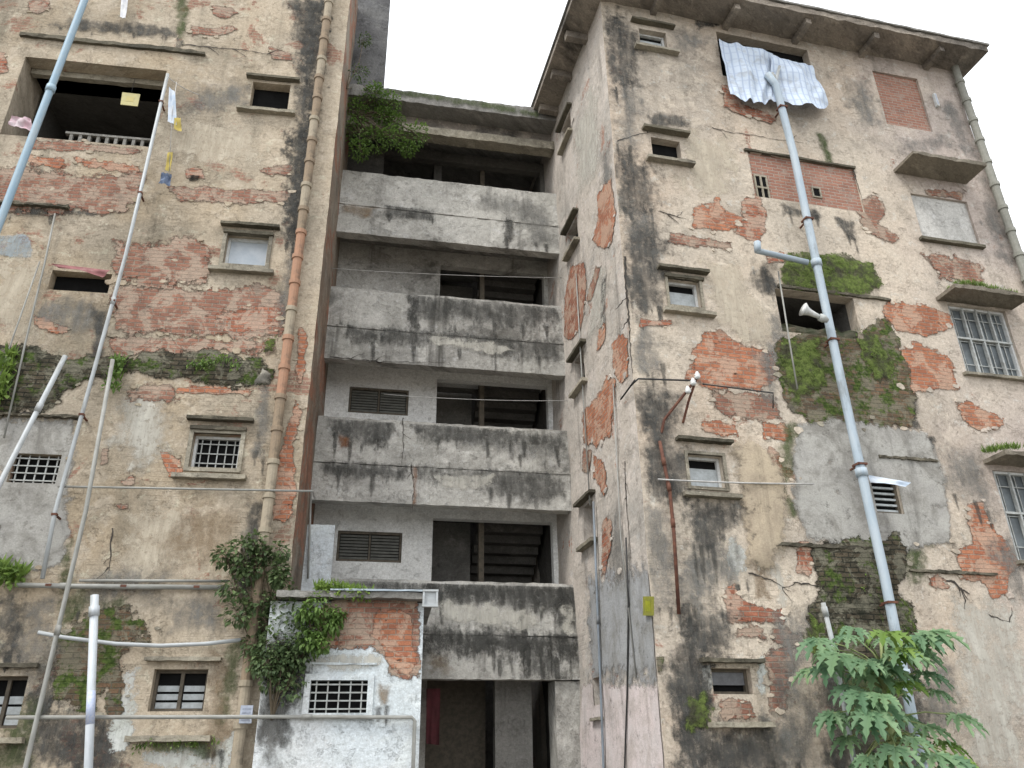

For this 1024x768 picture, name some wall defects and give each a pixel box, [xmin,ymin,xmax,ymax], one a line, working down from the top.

leakage [280,0,333,323]
flaking render [668,194,767,253]
flaking render [0,234,286,418]
leakage [324,419,565,507]
leakage [346,295,559,370]
flaking render [581,321,629,496]
leakage [575,6,885,768]
flaking render [685,299,1004,482]
flaking render [317,600,421,680]
leakage [355,581,577,680]
crack [748,573,823,600]
flaking render [718,531,919,722]